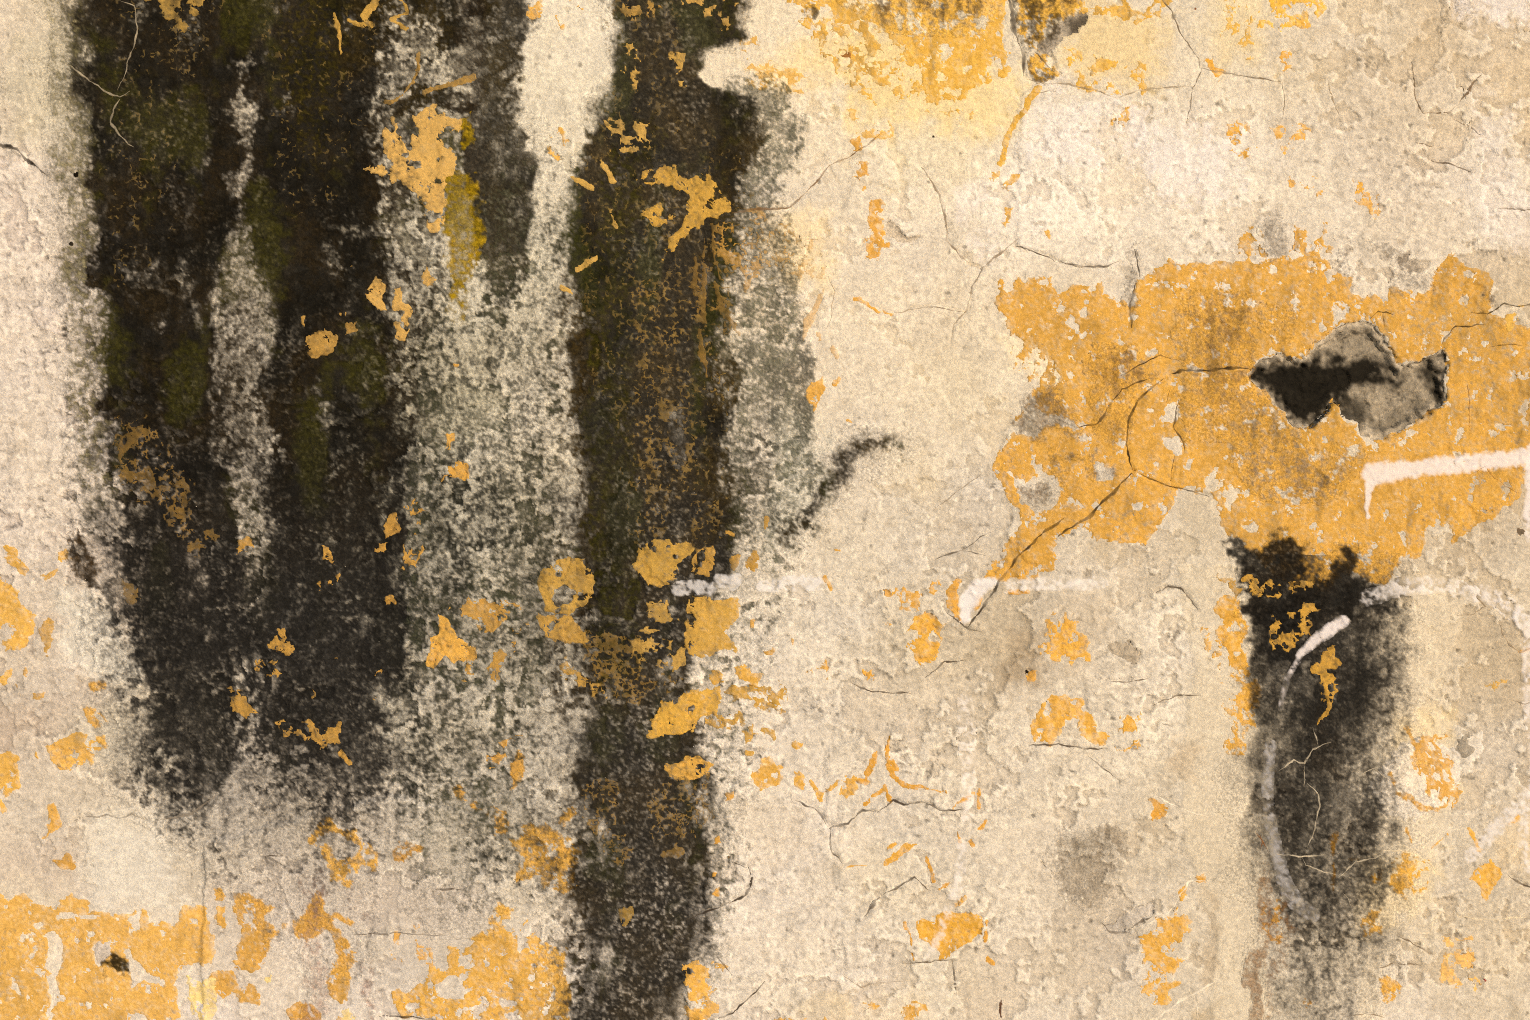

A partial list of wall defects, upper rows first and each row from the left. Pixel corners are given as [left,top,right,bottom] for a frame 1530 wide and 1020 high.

leakage [836,0,1291,268]
crack [1008,0,1285,124]
crack [895,167,1140,335]
peeling [111,414,254,559]
leakage [0,0,923,1020]
crack [852,354,1251,694]
leakage [1011,287,1368,513]
peeling [984,222,1530,595]
crack [1029,743,1113,776]
leakage [1212,524,1441,1020]
peeling [0,891,272,1020]
peeling [389,915,572,1020]